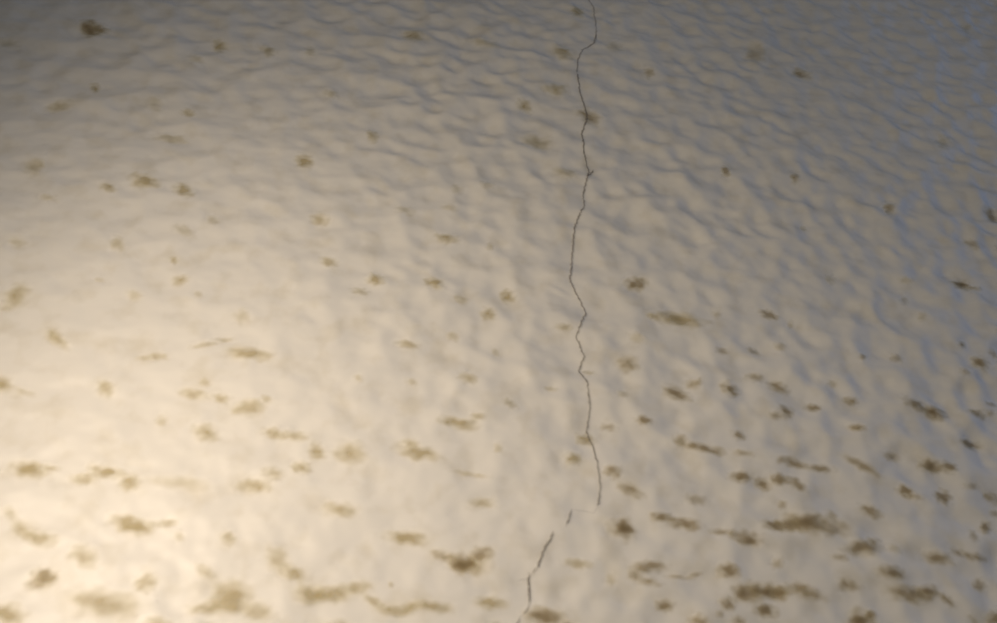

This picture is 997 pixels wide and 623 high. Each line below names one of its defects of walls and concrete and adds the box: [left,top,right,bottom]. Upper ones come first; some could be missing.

crack [517,512,571,623]